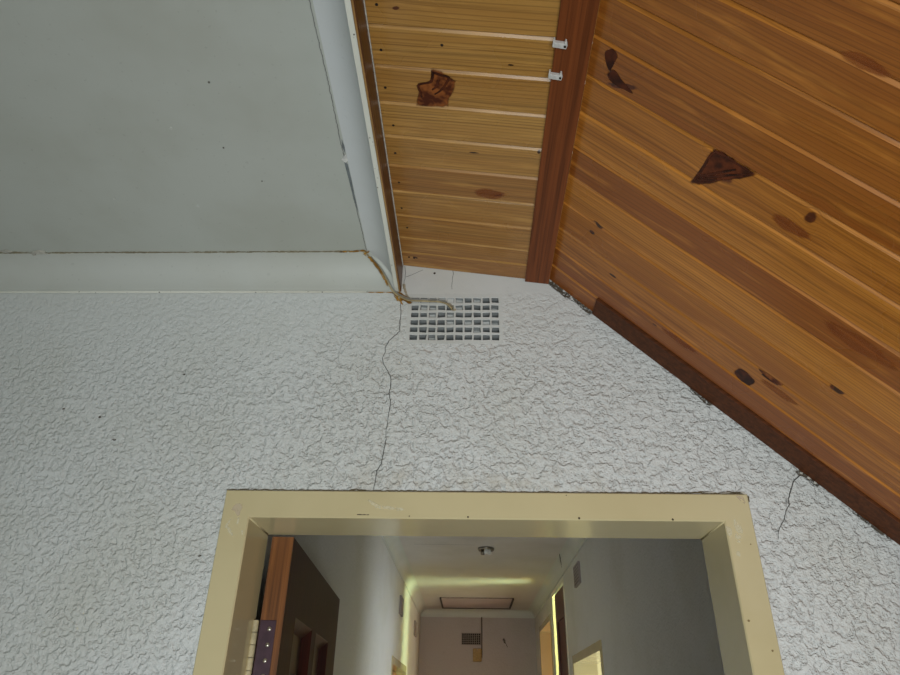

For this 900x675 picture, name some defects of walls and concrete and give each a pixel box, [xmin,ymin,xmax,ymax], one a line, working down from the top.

crack [227,269,750,502]
crack [775,476,799,538]